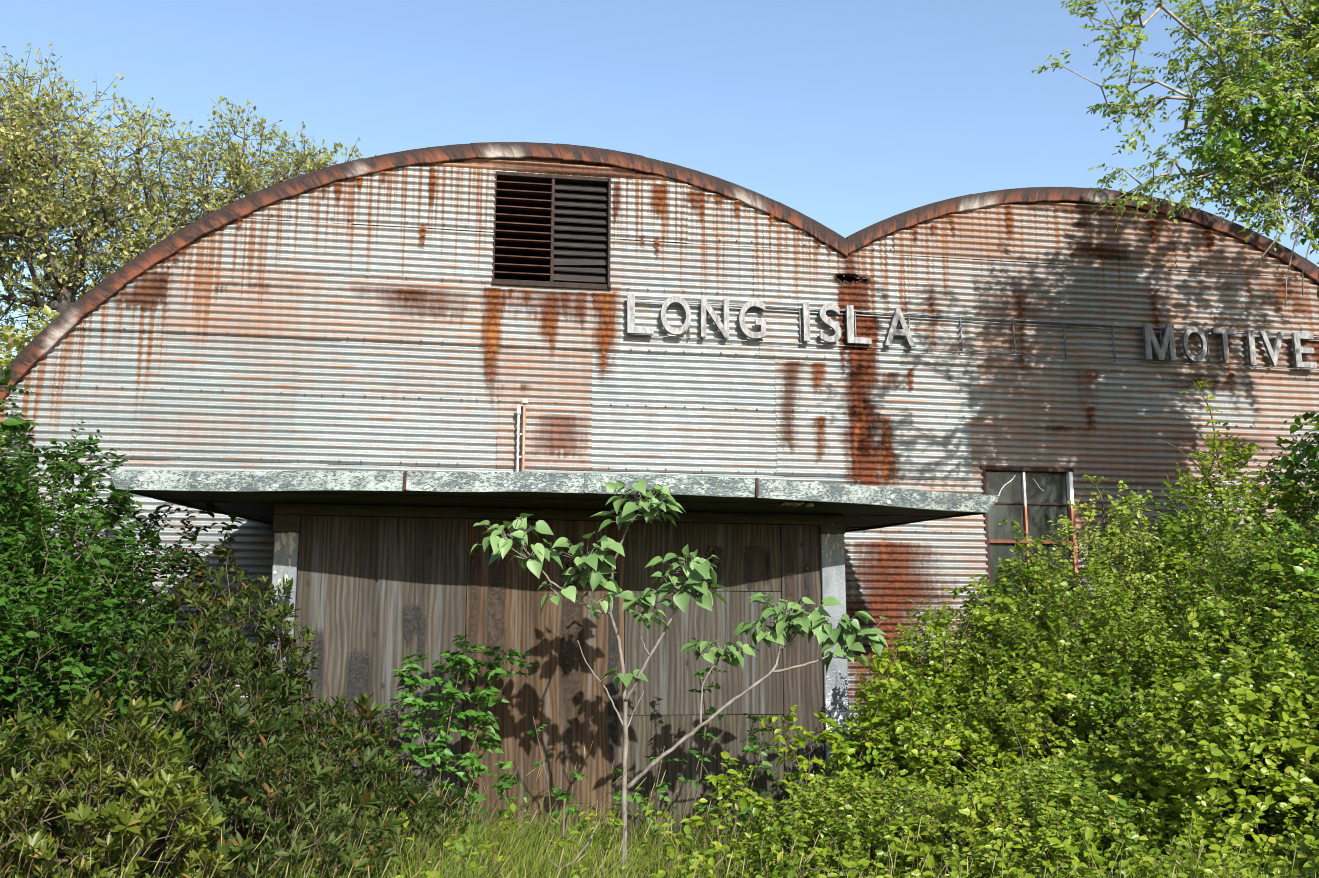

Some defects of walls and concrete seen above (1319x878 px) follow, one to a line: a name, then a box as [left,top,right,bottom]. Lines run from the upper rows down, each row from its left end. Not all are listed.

rust [322,176,363,202]
rust [687,190,740,223]
rust [1030,204,1169,243]
rust [1072,243,1131,260]
rust [114,247,186,308]
rust [362,286,448,315]
rust [1260,280,1308,315]
rust [482,287,615,388]
rust [782,252,914,486]
rust [1304,338,1319,364]
rust [543,415,576,456]
rust [845,541,944,733]